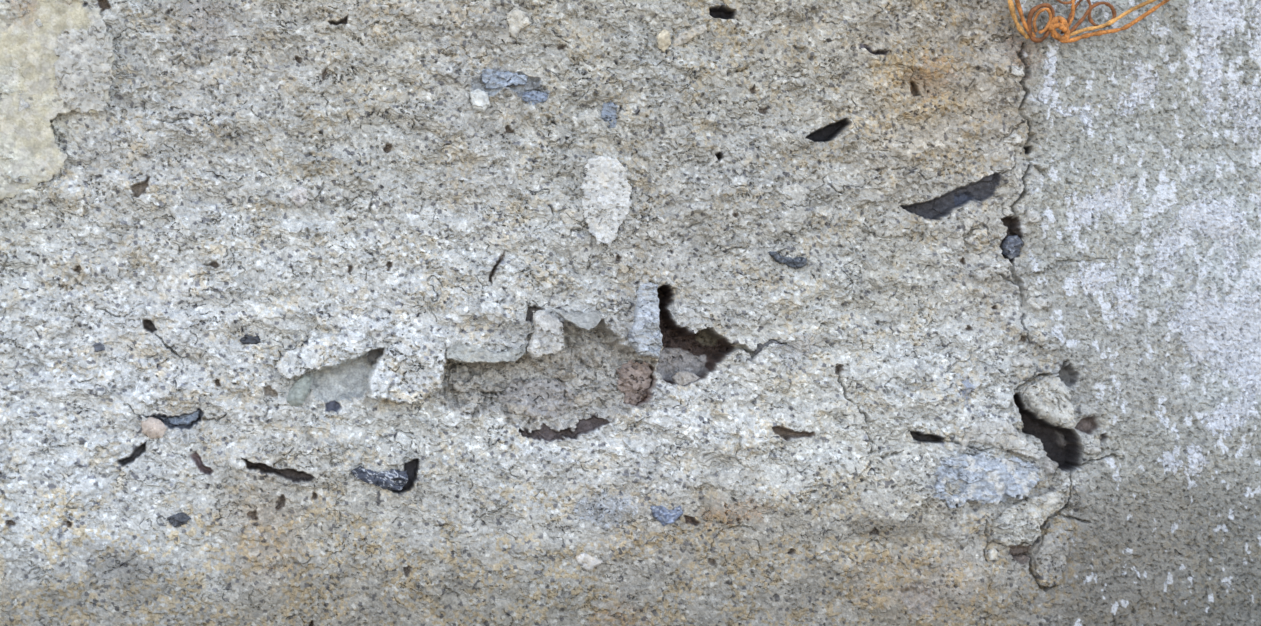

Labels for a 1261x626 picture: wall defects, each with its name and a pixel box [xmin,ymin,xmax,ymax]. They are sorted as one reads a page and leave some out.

flaking render [0,0,116,200]
crack [962,40,1047,256]
crack [1050,256,1112,279]
peeling [260,333,388,415]
spalling [435,283,788,444]
flaking render [880,358,1122,509]
crack [981,469,1094,593]